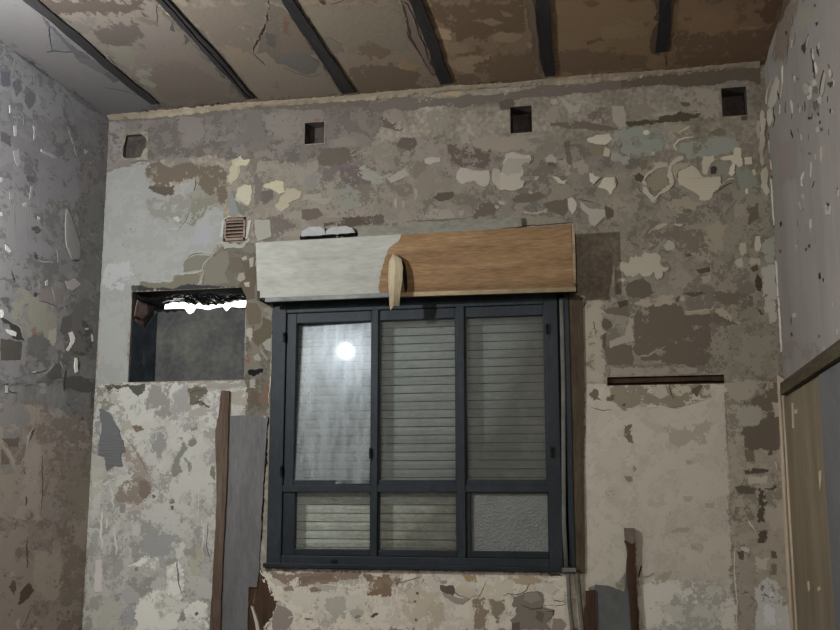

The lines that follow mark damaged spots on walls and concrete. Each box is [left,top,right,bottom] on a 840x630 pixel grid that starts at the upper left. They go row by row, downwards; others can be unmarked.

crack [253,0,270,65]
spalling [279,9,312,56]
peeling [587,134,612,157]
peeling [642,76,780,203]
peeling [226,156,252,205]
peeling [263,180,343,226]
peeling [456,152,616,227]
spalling [140,216,272,361]
peeling [602,240,675,365]
spalling [0,310,24,361]
spalling [440,585,473,624]
spalling [510,591,567,630]